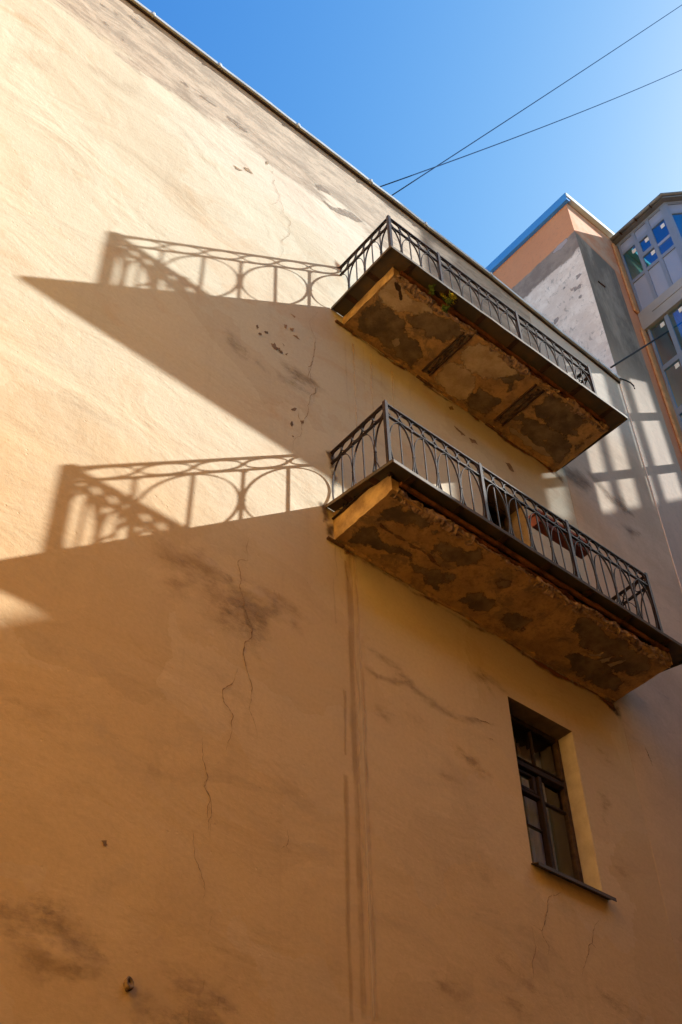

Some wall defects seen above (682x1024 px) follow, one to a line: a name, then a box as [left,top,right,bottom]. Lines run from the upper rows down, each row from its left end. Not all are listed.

flaking render [357,274,609,463]
spalling [348,488,672,692]
crack [193,536,257,898]